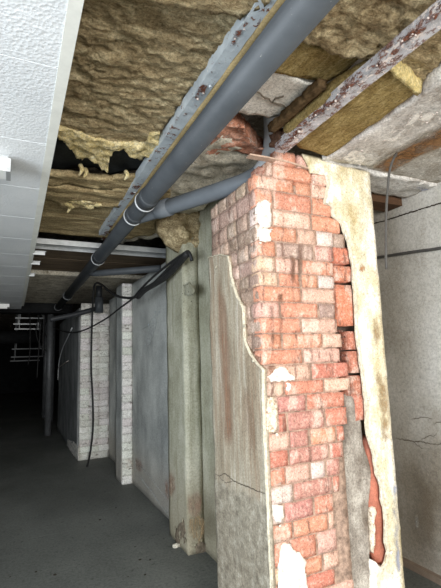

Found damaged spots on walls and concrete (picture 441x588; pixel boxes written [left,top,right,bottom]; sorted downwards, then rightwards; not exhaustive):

corrosion [403,13,438,42]
corrosion [269,75,362,148]
spalling [205,112,264,155]
peeling [339,150,366,166]
spalling [323,174,393,588]
spalling [210,254,274,588]
crack [397,417,441,449]
crack [216,473,265,494]